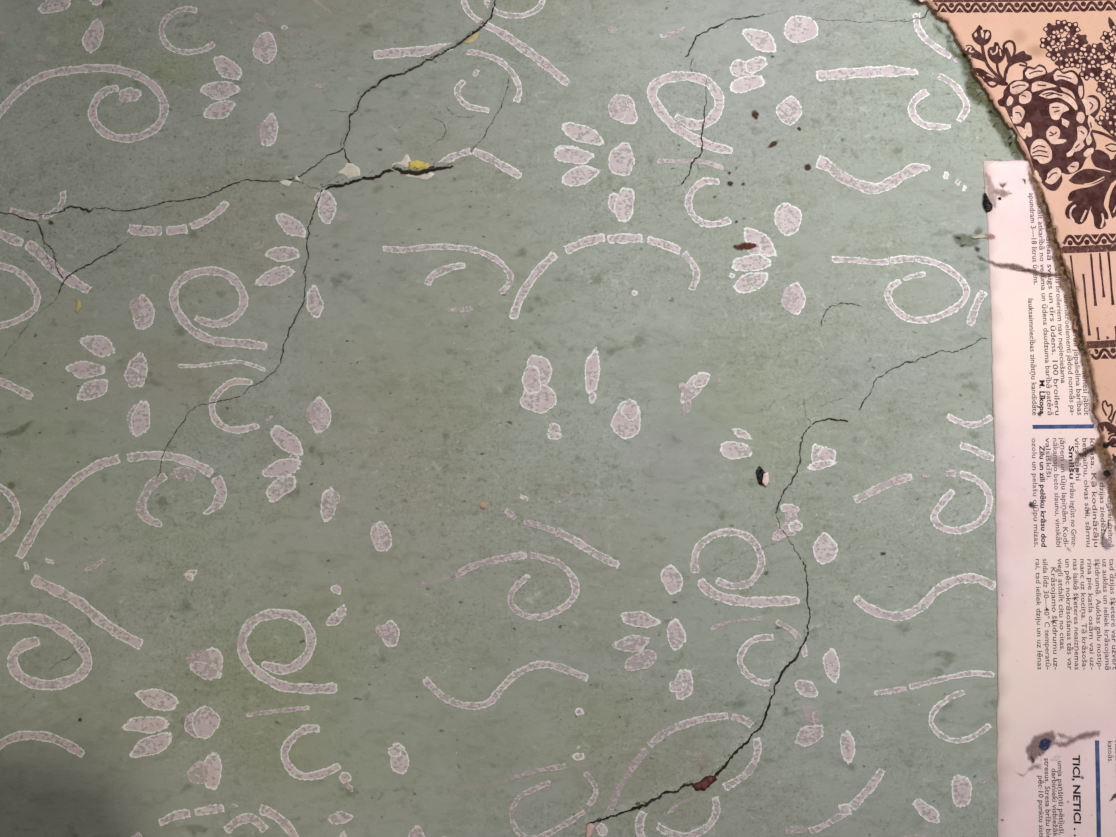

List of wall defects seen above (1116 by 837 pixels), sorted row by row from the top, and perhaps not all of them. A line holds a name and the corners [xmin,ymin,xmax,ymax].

crack [0,0,509,476]
crack [579,338,987,837]